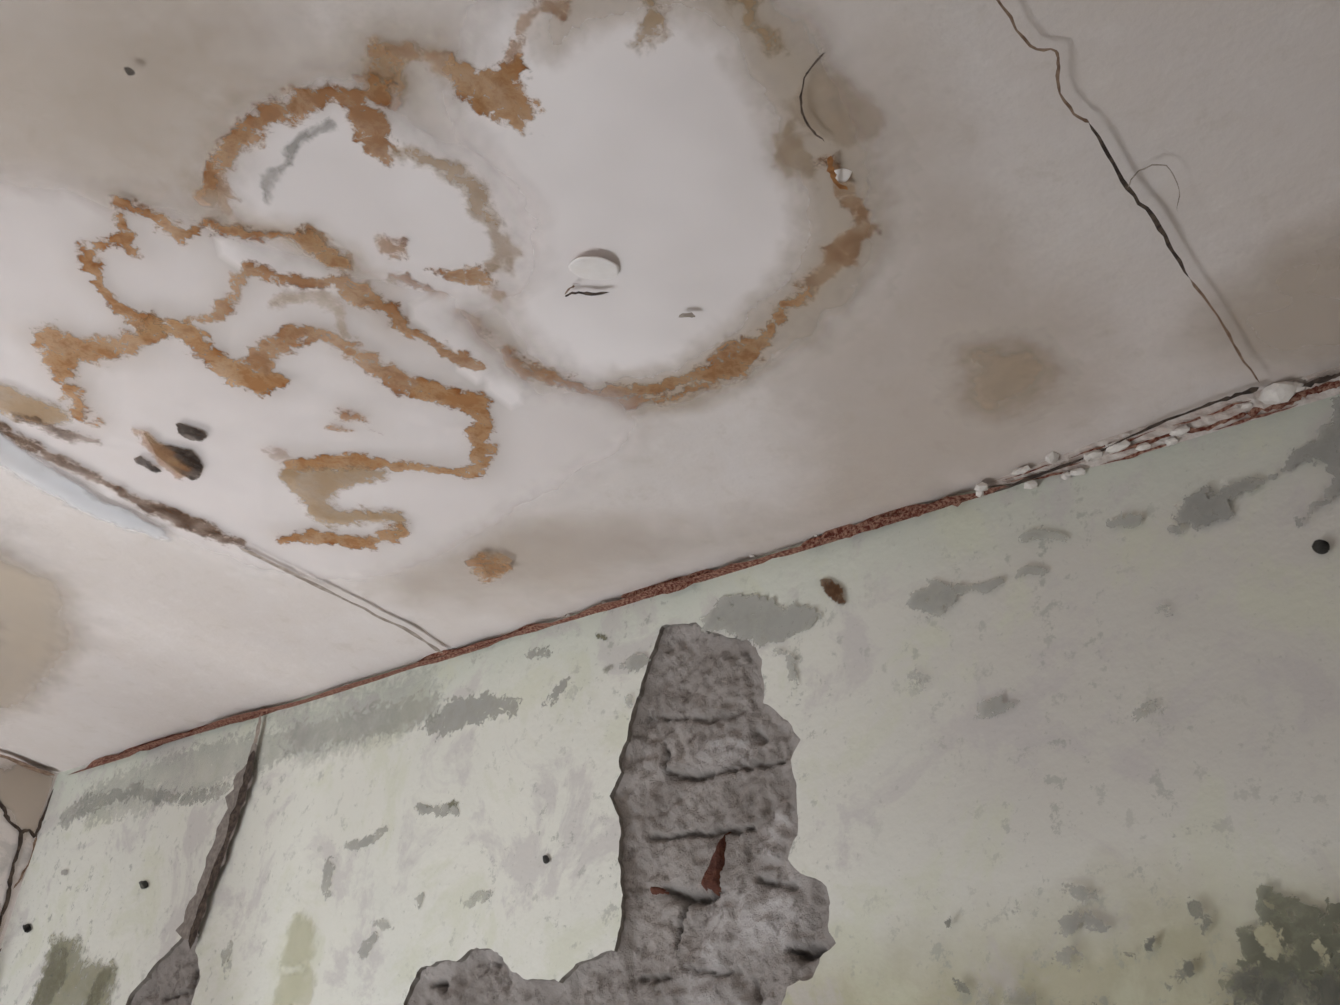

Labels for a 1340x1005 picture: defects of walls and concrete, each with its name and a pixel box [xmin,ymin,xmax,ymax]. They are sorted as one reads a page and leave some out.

crack [799,53,848,190]
crack [996,0,1259,382]
water stain [0,0,875,550]
crack [565,285,609,297]
peeling [134,423,207,480]
crack [69,365,1340,949]
crack [0,754,54,926]
spalling [131,935,200,1005]
peeling [321,856,335,897]
peeling [345,826,388,852]
spalling [407,593,836,1005]
peeling [1218,885,1340,1005]